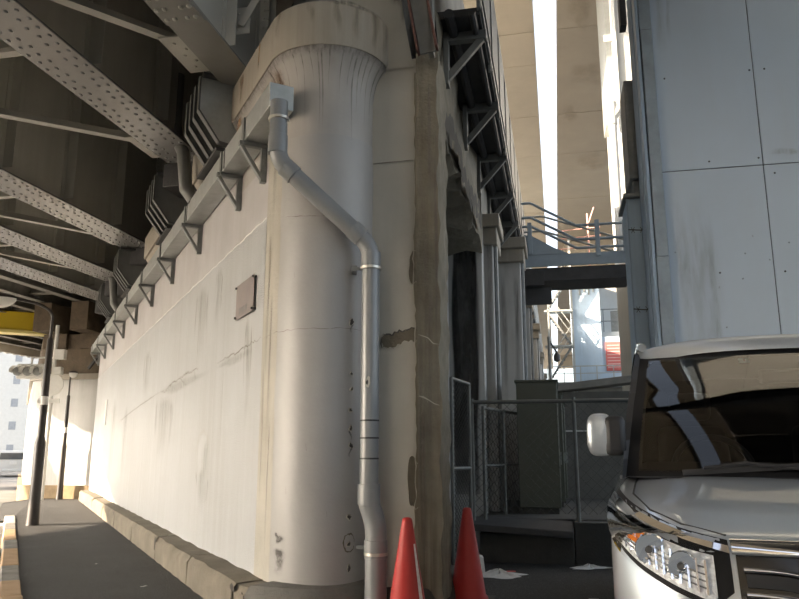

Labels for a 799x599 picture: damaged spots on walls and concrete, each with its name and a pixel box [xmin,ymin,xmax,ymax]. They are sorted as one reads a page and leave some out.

peeling [380,73,418,553]